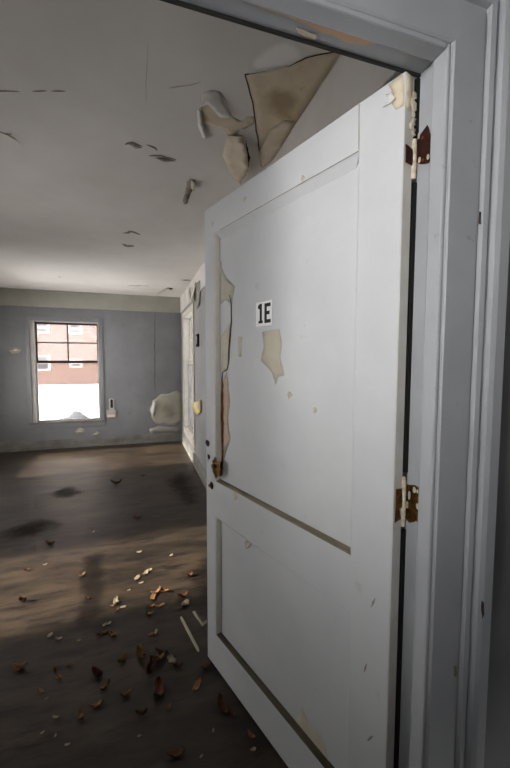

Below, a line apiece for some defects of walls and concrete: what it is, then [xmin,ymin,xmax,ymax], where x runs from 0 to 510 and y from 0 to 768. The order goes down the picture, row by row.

peeling [197,52,340,185]
peeling [383,74,420,139]
peeling [183,179,196,204]
peeling [261,329,284,384]
peeling [149,391,201,433]